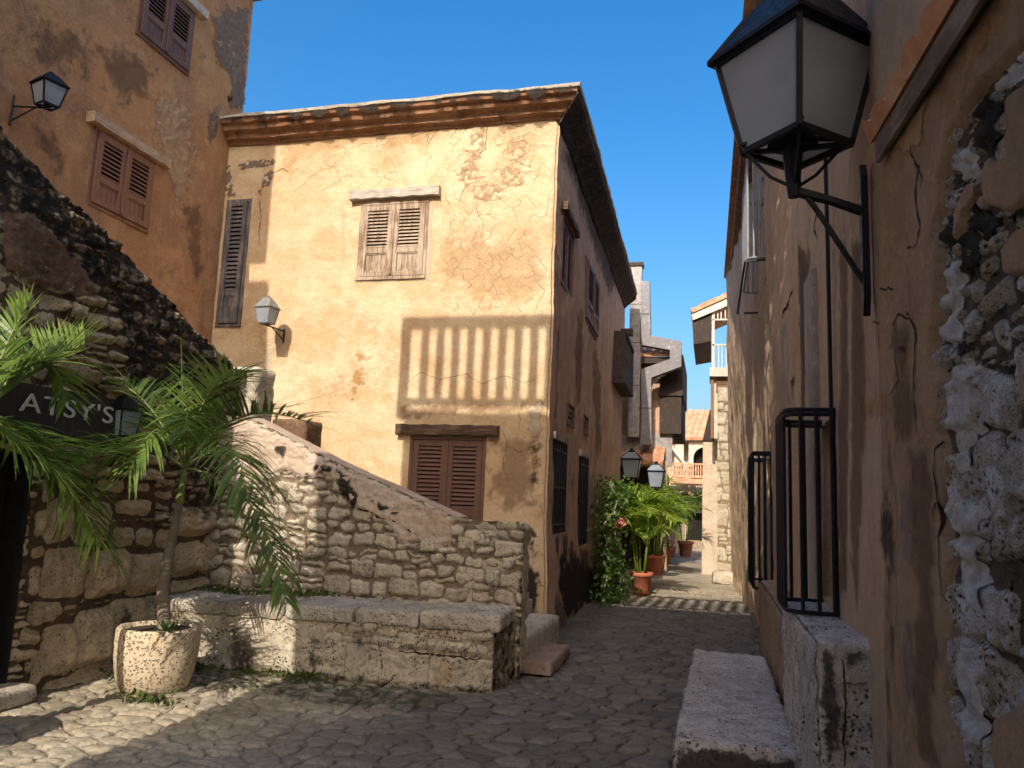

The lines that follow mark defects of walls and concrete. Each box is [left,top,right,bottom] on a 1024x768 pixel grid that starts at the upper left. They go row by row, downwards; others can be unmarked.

flaking render [206,5,251,147]
flaking render [225,159,276,197]
crack [275,123,550,317]
crack [907,148,922,249]
crack [872,286,947,601]